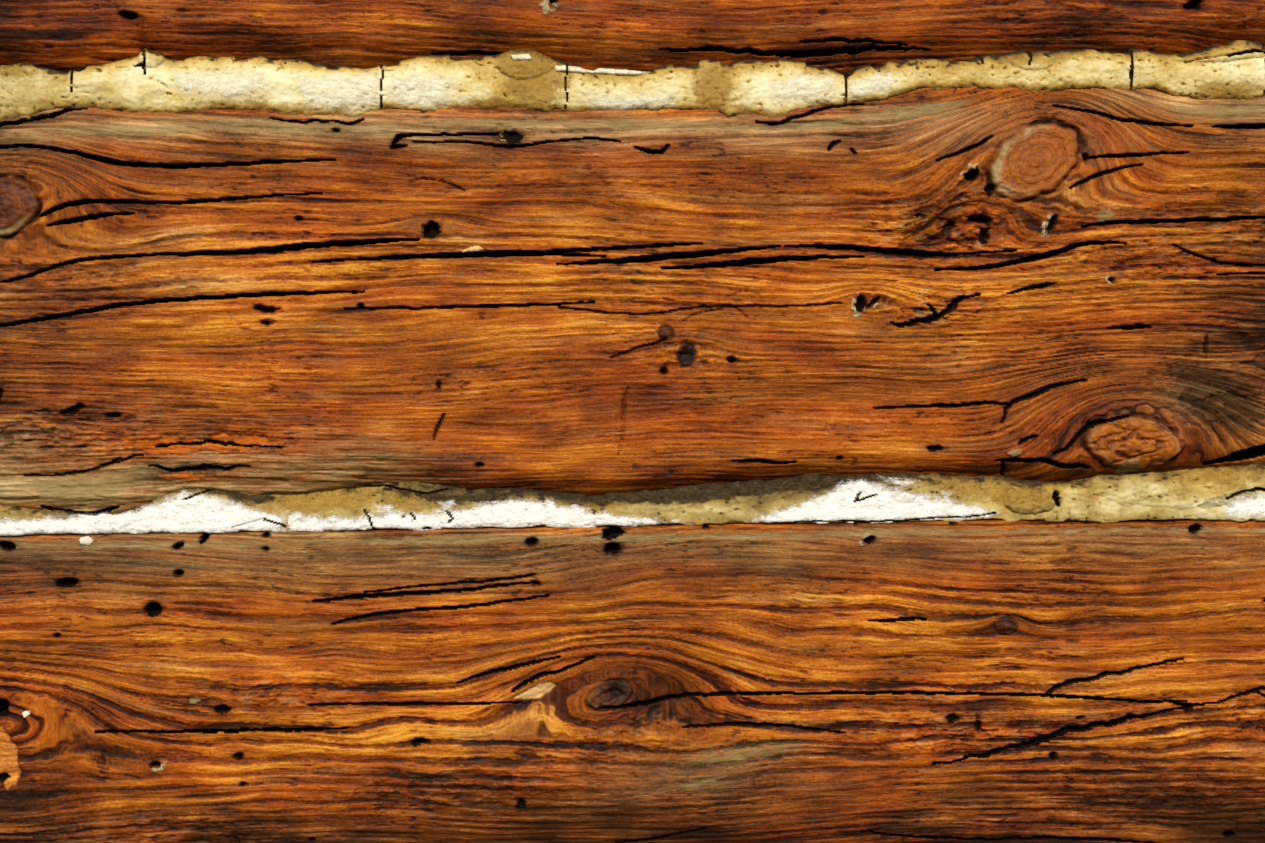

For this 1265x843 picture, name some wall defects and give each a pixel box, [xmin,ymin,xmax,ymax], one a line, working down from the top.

crack [0,64,336,169]
crack [269,64,671,154]
crack [936,135,994,161]
crack [1052,49,1265,189]
crack [39,193,322,227]
crack [0,216,1265,358]
crack [597,658,1265,765]